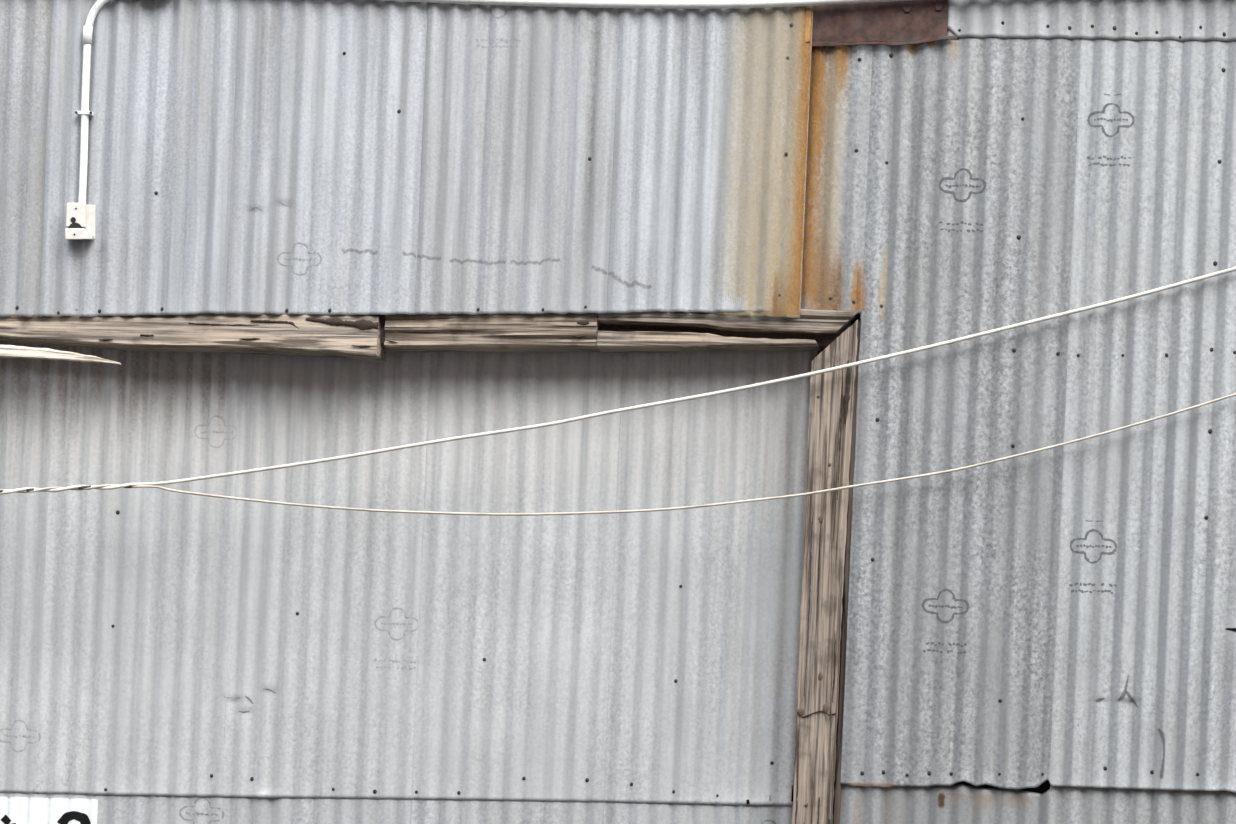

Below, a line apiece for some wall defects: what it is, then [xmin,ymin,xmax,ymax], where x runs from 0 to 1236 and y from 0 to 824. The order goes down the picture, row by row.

corrosion [774,9,863,314]